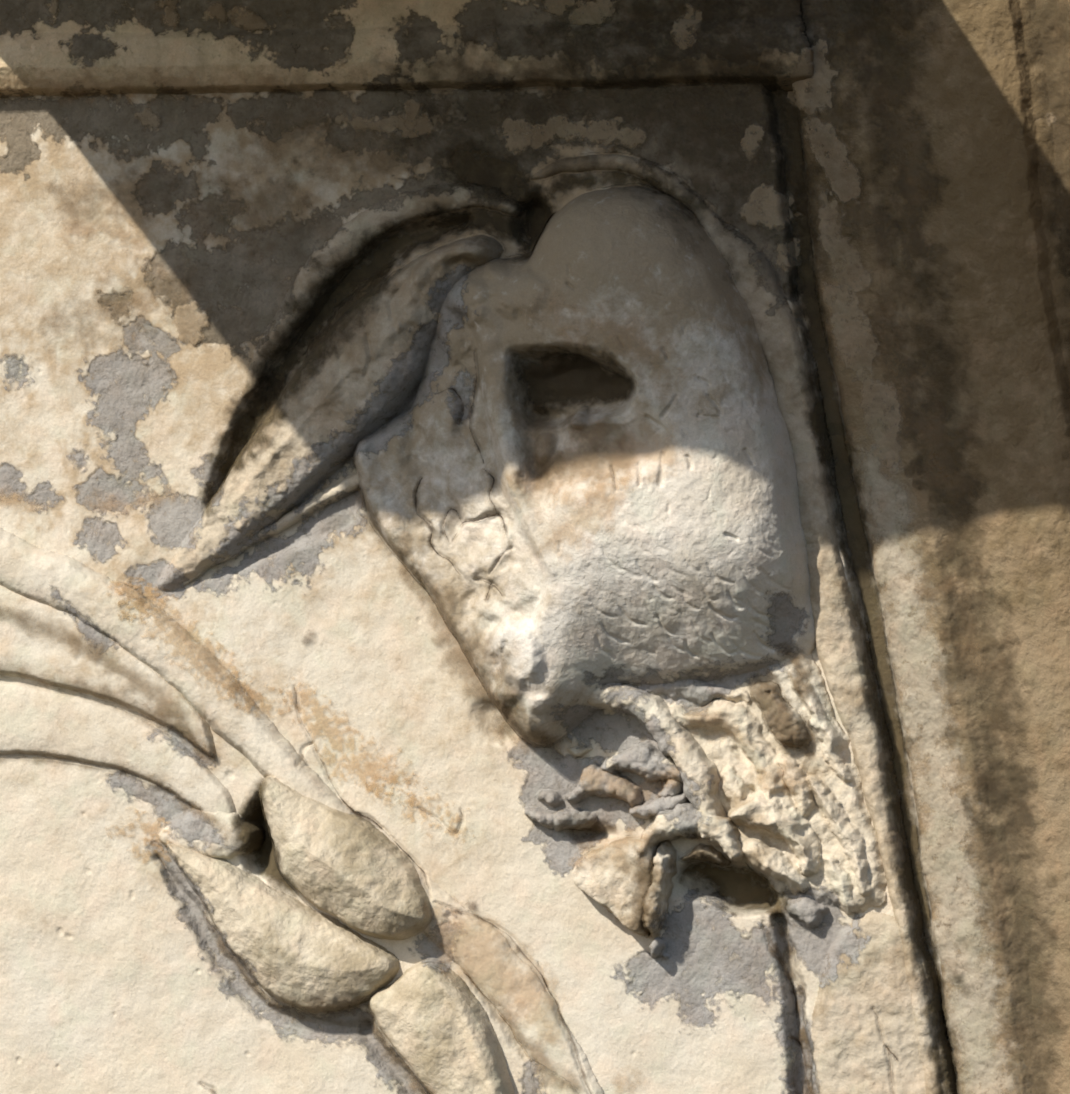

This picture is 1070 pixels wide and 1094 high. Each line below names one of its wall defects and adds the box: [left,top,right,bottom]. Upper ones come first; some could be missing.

peeling [0,0,801,600]
peeling [453,0,1014,1094]
water stain [942,597,1022,803]